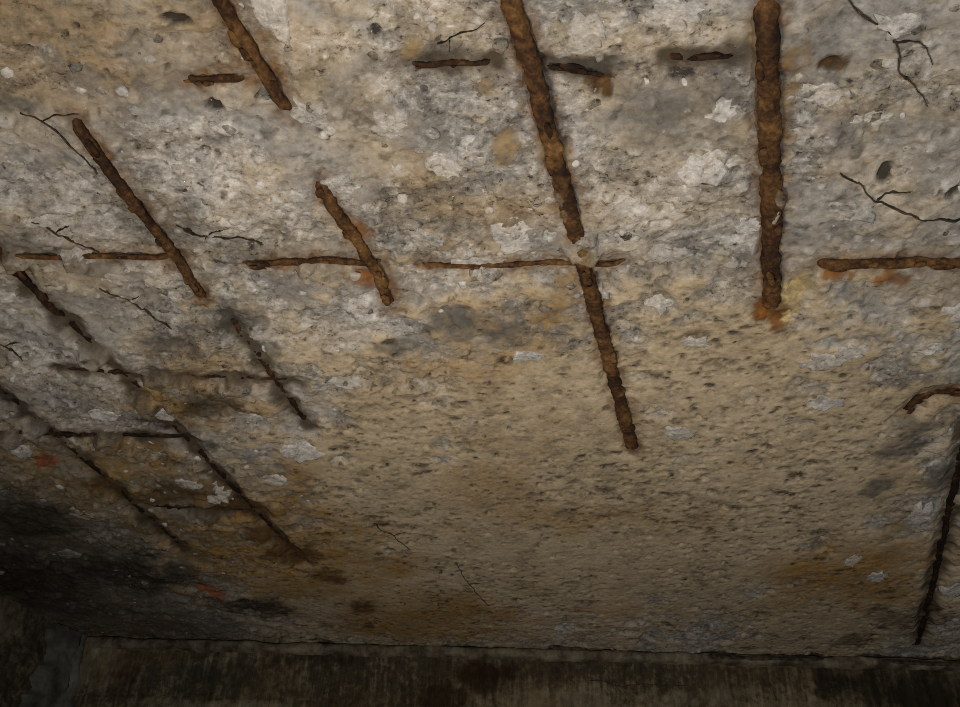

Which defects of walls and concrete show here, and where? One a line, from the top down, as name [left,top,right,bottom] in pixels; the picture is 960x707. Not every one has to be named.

corrosion [584,74,612,97]
crack [848,0,933,107]
spalling [160,0,960,450]
crack [840,172,960,223]
spalling [0,0,411,639]
corrosion [753,299,789,330]
spalling [866,443,960,657]
damp [216,599,288,618]